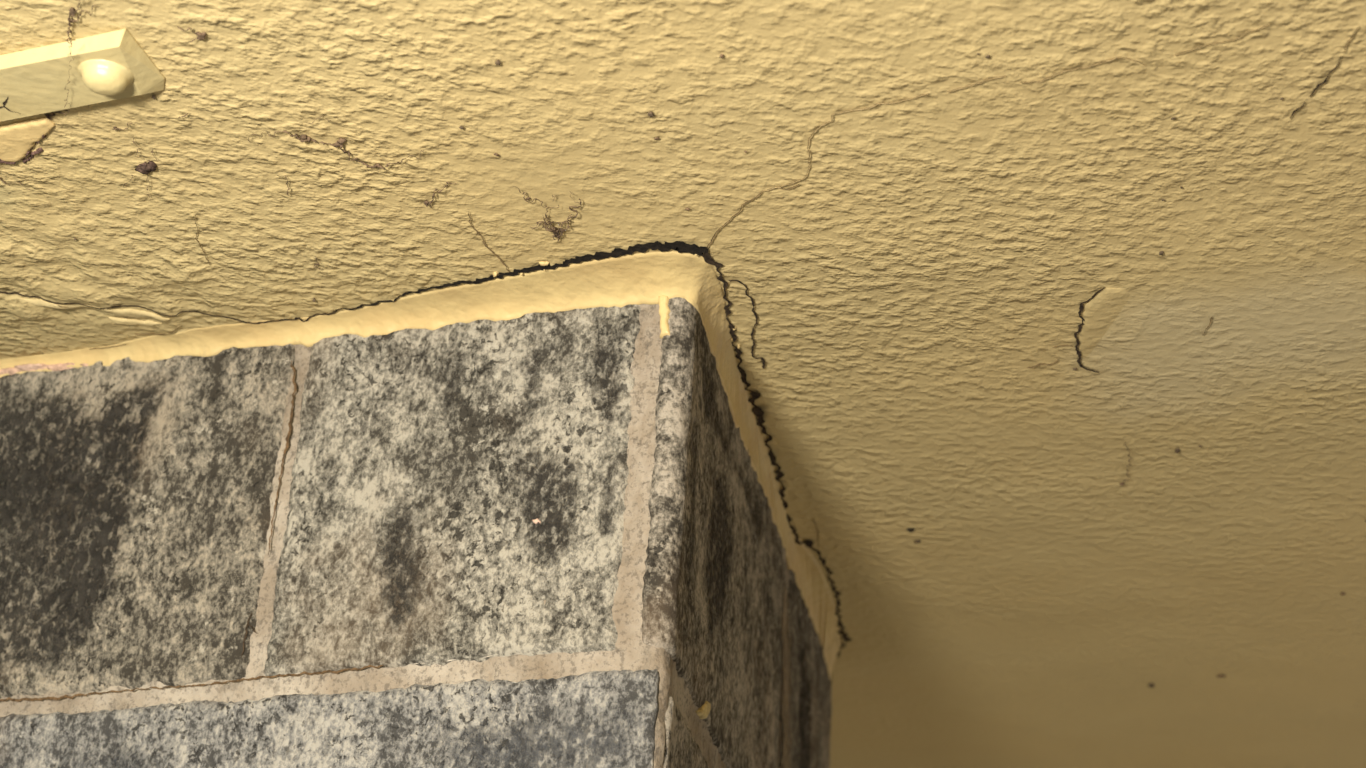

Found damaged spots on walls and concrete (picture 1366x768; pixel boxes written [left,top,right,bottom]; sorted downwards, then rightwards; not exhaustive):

crack [1290,26,1359,118]
crack [0,25,1270,657]
water stain [0,379,164,671]